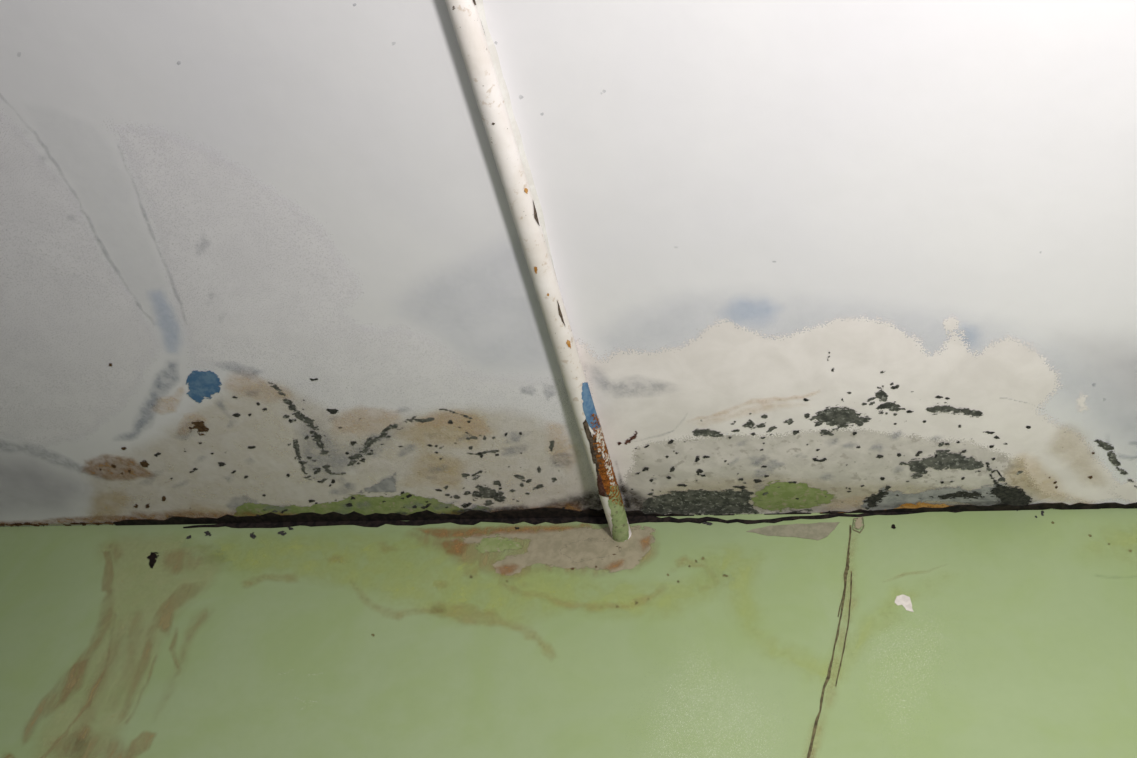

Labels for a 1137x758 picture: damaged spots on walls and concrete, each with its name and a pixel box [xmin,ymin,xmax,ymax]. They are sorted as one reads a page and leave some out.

flaking render [189,417,209,435]
peeling [186,370,222,404]
peeling [233,382,557,517]
peeling [582,382,615,497]
peeling [425,456,846,576]
peeling [692,371,983,438]
leakage [575,313,1137,512]
peeling [861,442,1033,510]
crack [0,439,1137,758]